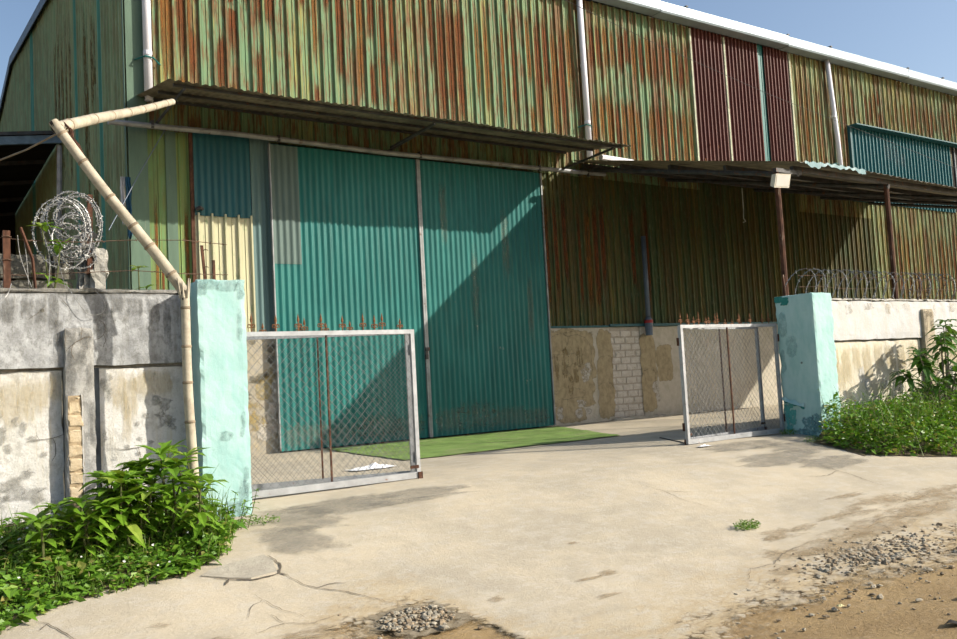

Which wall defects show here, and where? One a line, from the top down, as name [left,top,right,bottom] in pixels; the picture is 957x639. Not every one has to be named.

corrosion [83,32,96,161]
corrosion [160,0,196,82]
corrosion [217,0,274,89]
corrosion [300,0,344,76]
corrosion [355,0,398,113]
corrosion [418,0,465,121]
corrosion [473,19,490,104]
corrosion [499,19,573,135]
corrosion [588,26,689,89]
corrosion [592,98,707,161]
corrosion [837,89,957,166]
crack [215,555,392,630]